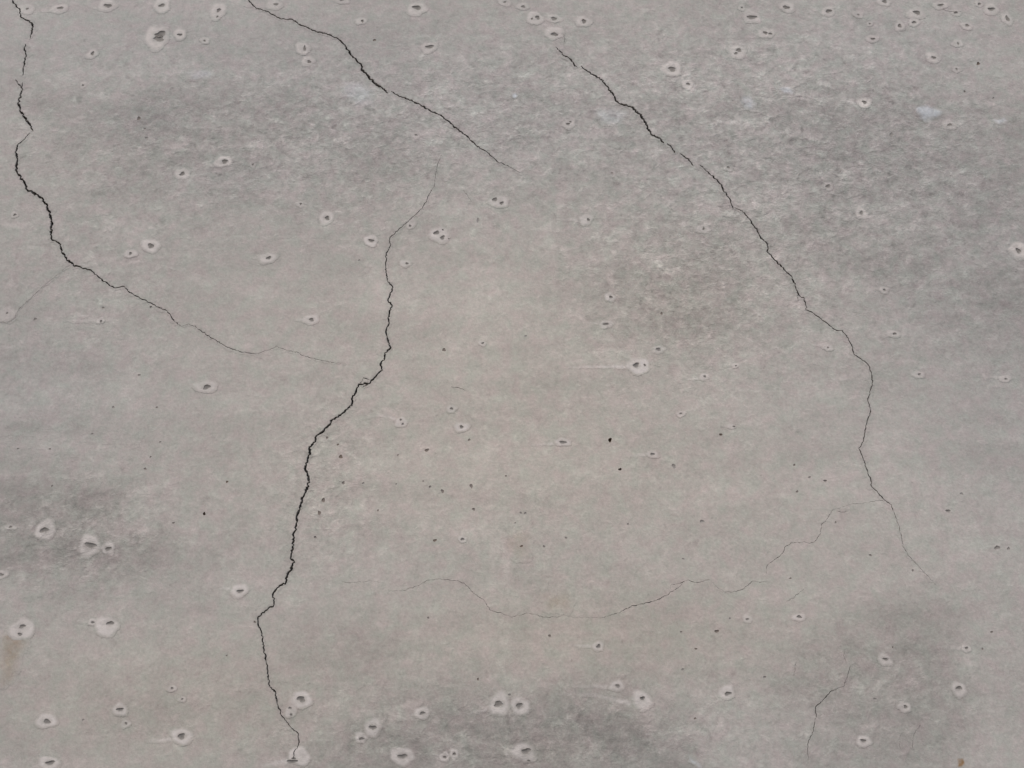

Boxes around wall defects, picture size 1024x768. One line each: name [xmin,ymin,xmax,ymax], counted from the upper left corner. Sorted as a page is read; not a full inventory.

crack [2,0,442,759]
crack [244,0,524,175]
crack [345,35,937,618]